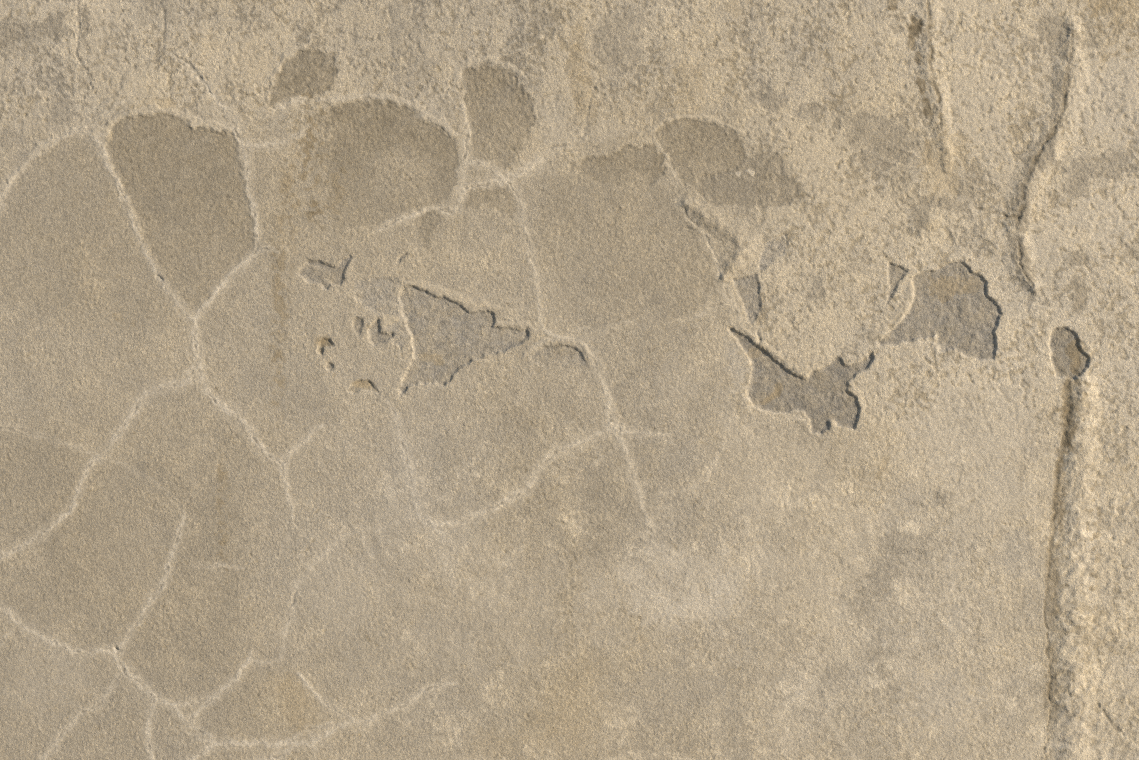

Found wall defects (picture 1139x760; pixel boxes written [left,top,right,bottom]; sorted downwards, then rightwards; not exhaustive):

crack [0,0,460,760]
peeling [266,41,537,263]
spalling [297,255,537,397]
crack [372,39,730,596]
peeling [567,113,804,211]
crack [653,137,764,339]
spalling [727,233,1003,434]
spalling [1048,326,1090,379]
damp [290,331,1066,755]
crack [601,748,706,760]